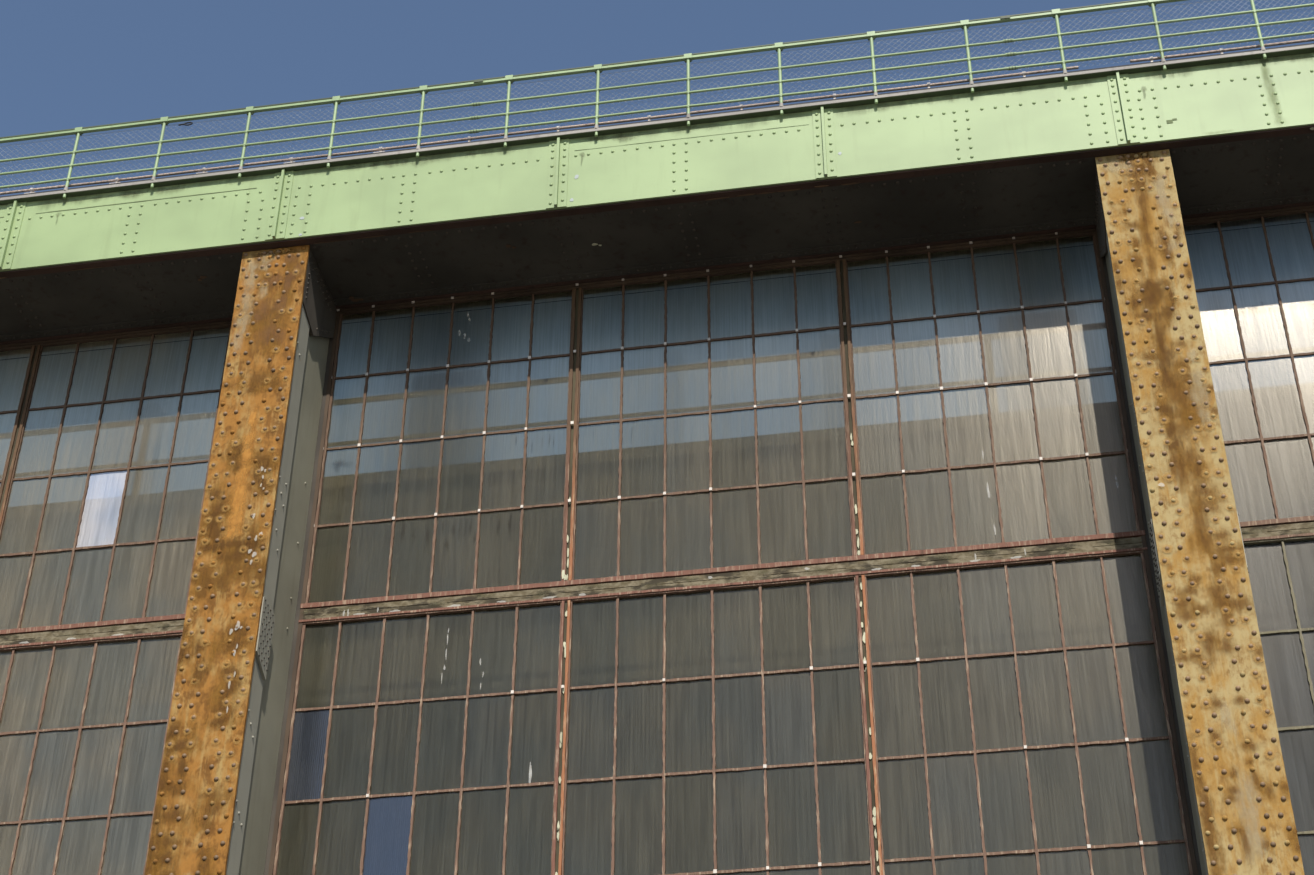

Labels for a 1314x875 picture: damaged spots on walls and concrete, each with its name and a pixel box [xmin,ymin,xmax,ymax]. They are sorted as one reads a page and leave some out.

rust [1133,281,1192,448]
rust [204,411,271,581]